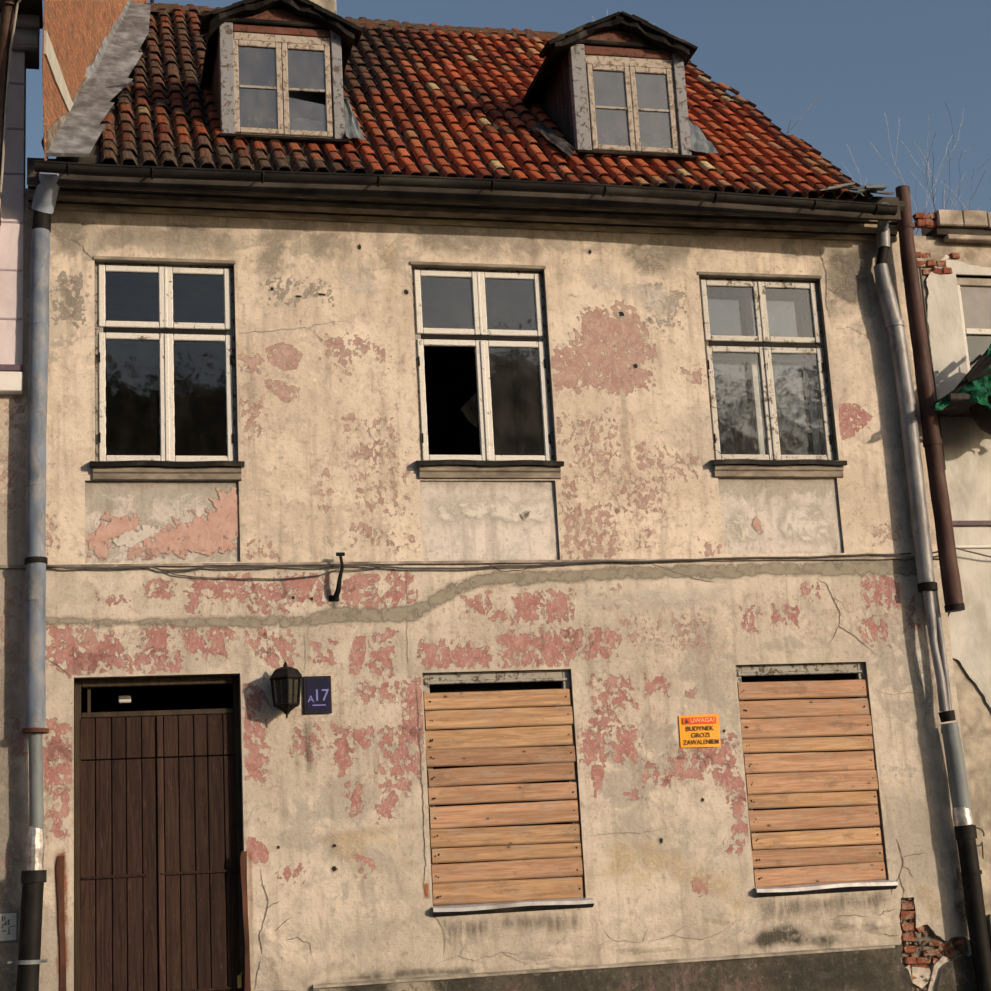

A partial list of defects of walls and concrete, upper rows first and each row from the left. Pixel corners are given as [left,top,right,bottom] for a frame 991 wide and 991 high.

peeling [551,282,687,396]
peeling [45,623,339,679]
peeling [86,487,418,617]
crack [401,569,409,665]
peeling [289,584,712,825]
crack [648,562,713,582]
crack [816,578,879,656]
peeling [577,672,748,857]
crack [416,688,566,965]
crack [254,875,312,991]
crack [587,923,732,948]
spalling [899,897,968,991]